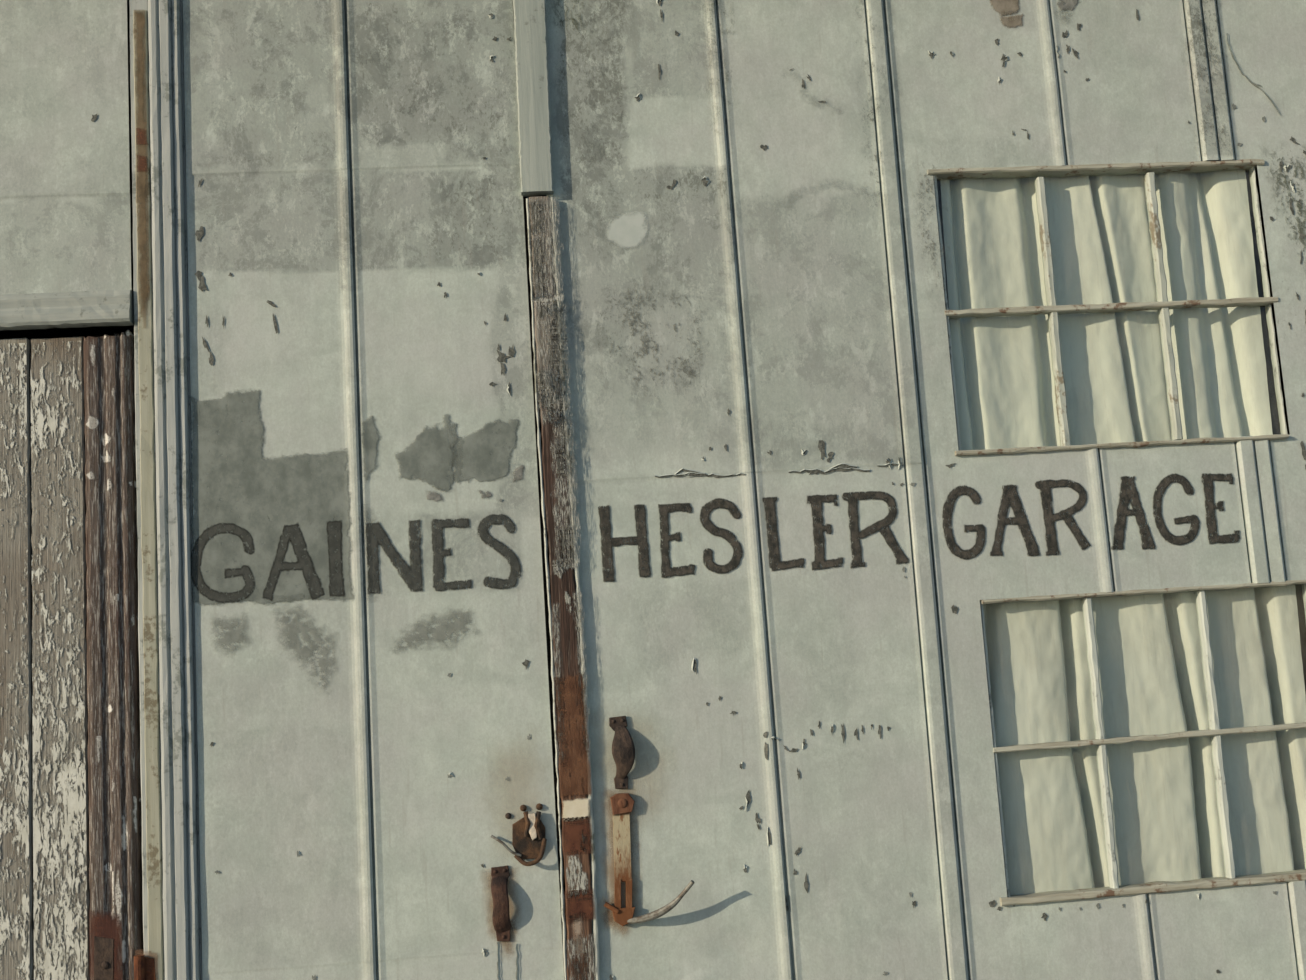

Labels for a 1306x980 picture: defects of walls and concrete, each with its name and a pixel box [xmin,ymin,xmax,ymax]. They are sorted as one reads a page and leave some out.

peeling [990,0,1023,84]
peeling [190,390,379,605]
peeling [395,414,524,502]
peeling [0,331,141,980]
corrosion [89,913,155,980]